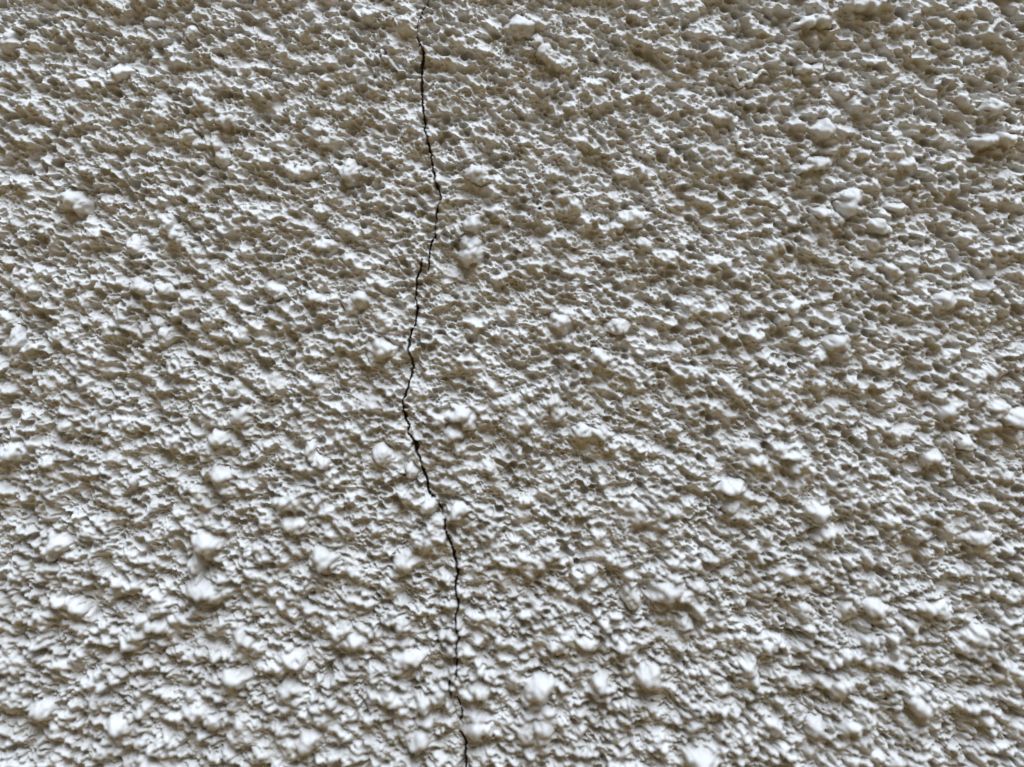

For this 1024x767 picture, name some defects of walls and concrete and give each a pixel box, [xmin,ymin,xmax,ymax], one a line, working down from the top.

crack [402,0,468,767]